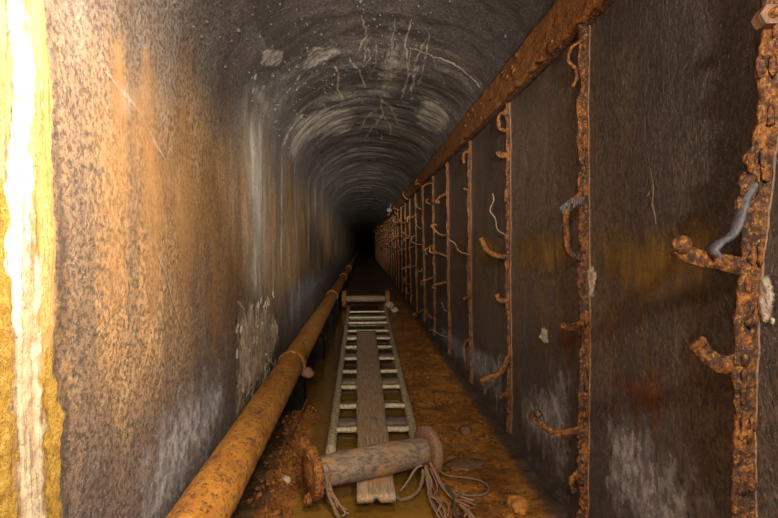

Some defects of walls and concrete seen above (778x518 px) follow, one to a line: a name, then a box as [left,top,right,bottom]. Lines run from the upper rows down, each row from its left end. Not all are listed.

crack [410,48,480,88]
corrosion [756,53,778,78]
crack [359,96,400,141]
corrosion [756,102,775,127]
damp [0,0,65,518]
damp [236,46,368,412]
corrosion [738,352,758,454]
damp [612,429,686,518]